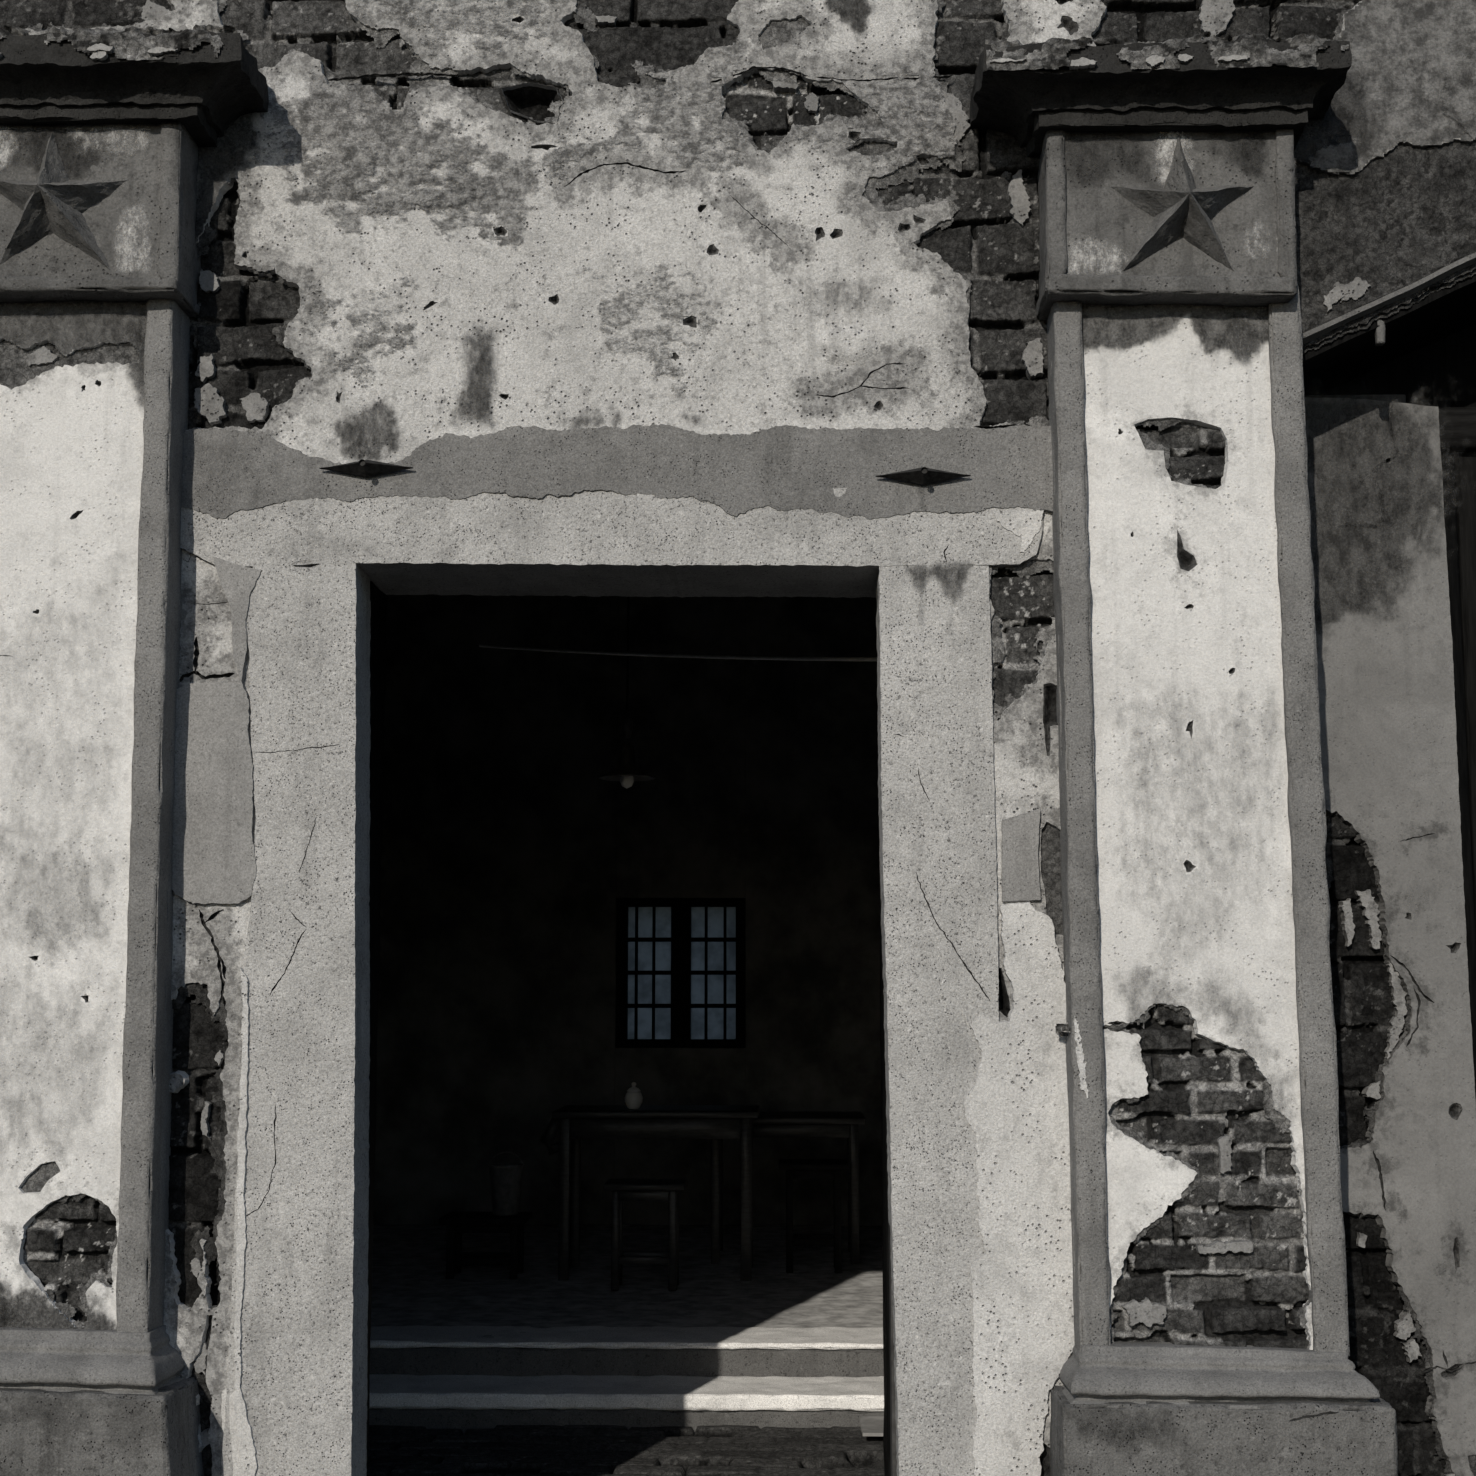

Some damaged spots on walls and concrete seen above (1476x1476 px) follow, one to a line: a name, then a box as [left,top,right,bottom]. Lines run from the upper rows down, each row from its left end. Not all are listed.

peeling [188,170,312,430]
peeling [0,0,573,124]
crack [564,162,685,187]
peeling [721,0,1362,427]
spalling [1118,417,1229,489]
crack [199,909,226,999]
crack [916,873,990,1000]
peeling [1325,810,1413,1149]
peeling [18,1161,118,1327]
peeling [166,982,229,1476]
peeling [1103,1003,1311,1350]
peeling [1343,1211,1476,1476]